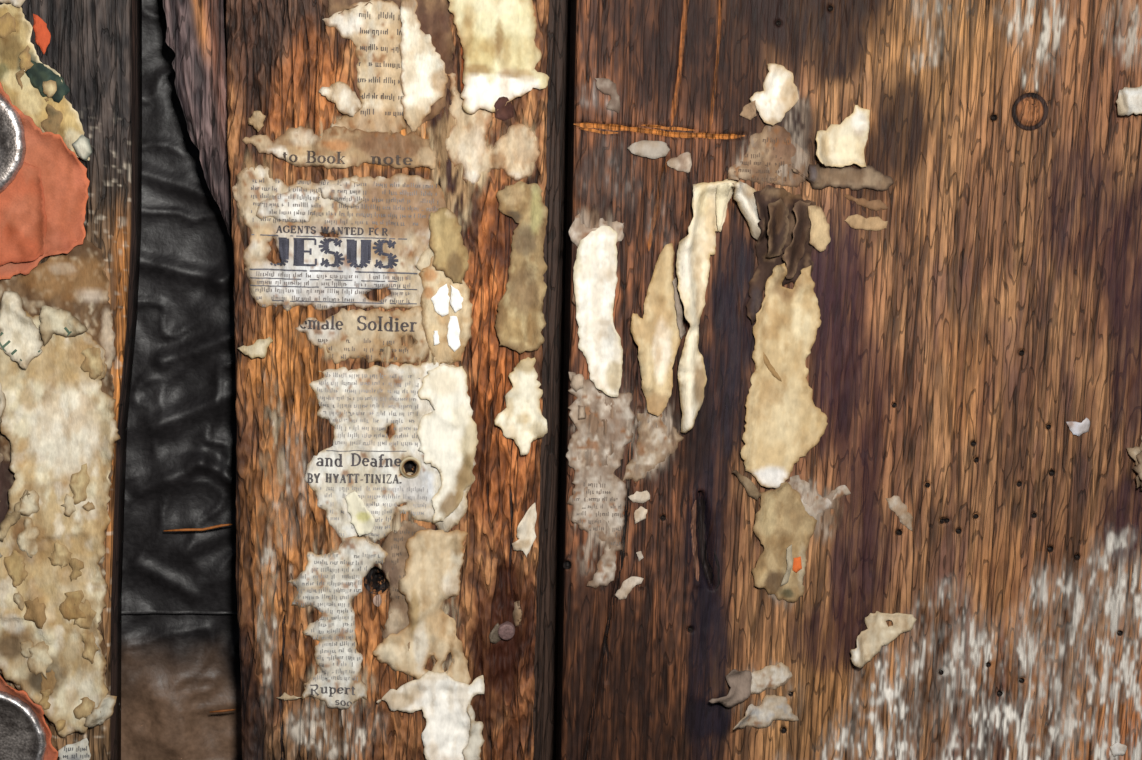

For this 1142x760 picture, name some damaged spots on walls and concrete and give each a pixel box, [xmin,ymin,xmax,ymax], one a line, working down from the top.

peeling [319,81,362,116]
peeling [449,0,549,115]
peeling [740,63,799,125]
peeling [816,105,870,167]
peeling [0,291,88,369]
peeling [573,179,761,433]
water stain [811,223,859,420]
peeling [494,357,548,455]
peeling [373,365,485,760]
water stain [1112,482,1142,554]
peeling [823,611,917,760]
peeling [942,534,1142,760]